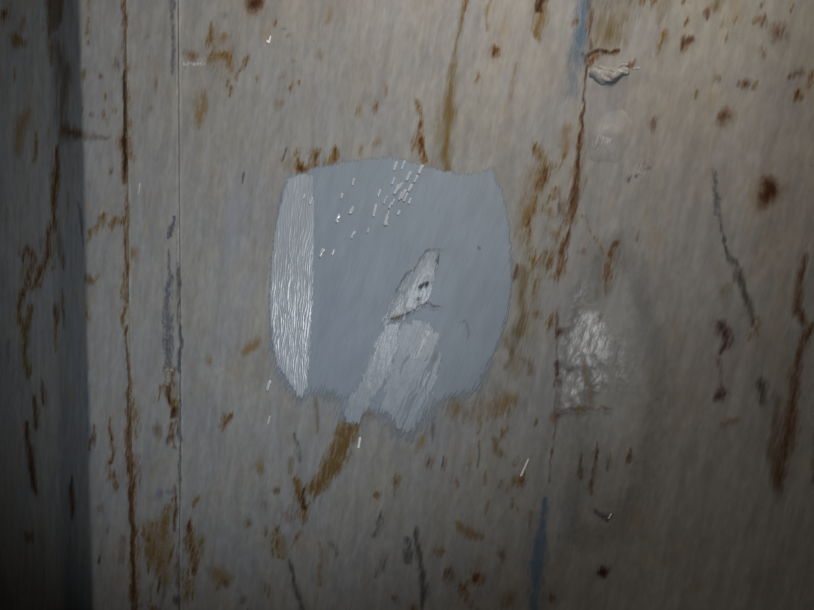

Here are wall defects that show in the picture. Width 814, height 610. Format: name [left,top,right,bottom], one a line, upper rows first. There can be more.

rust [443,64,454,172]
crack [554,13,620,279]
rust [17,146,60,377]
rust [293,422,360,524]
rust [174,520,203,602]